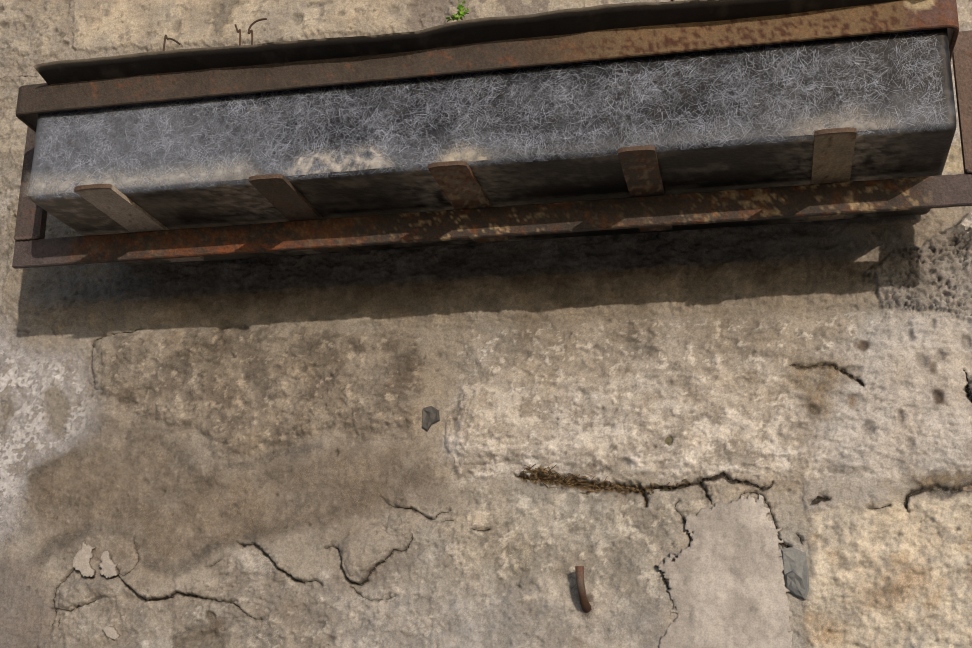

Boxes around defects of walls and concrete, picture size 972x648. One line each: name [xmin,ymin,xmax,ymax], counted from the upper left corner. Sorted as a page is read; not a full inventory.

crack [790,364,864,387]
crack [963,370,972,403]
water stain [0,333,93,539]
crack [380,496,490,532]
crack [517,472,803,548]
crack [811,496,830,505]
crack [869,486,968,512]
peeling [73,541,119,579]
crack [52,543,255,626]
crack [239,543,323,586]
crack [326,536,413,601]